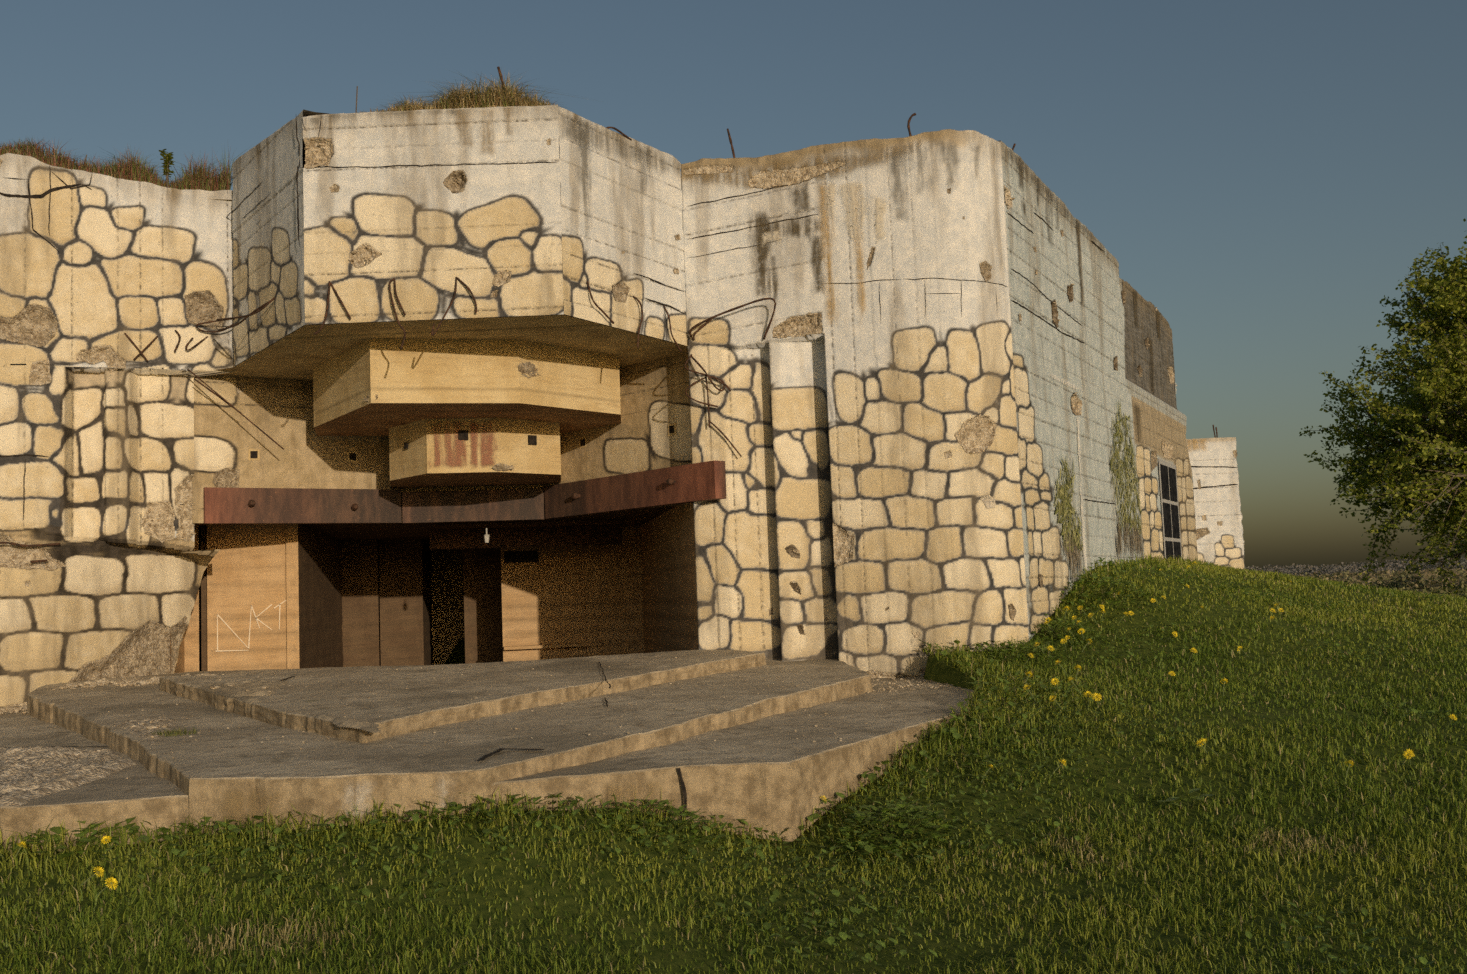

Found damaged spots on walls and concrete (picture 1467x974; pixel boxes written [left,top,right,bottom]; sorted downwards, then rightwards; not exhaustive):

water stain [687,147,911,293]
spalling [0,304,59,385]
spalling [76,345,126,373]
spalling [773,312,822,339]
spalling [944,414,997,459]
spalling [0,532,65,587]